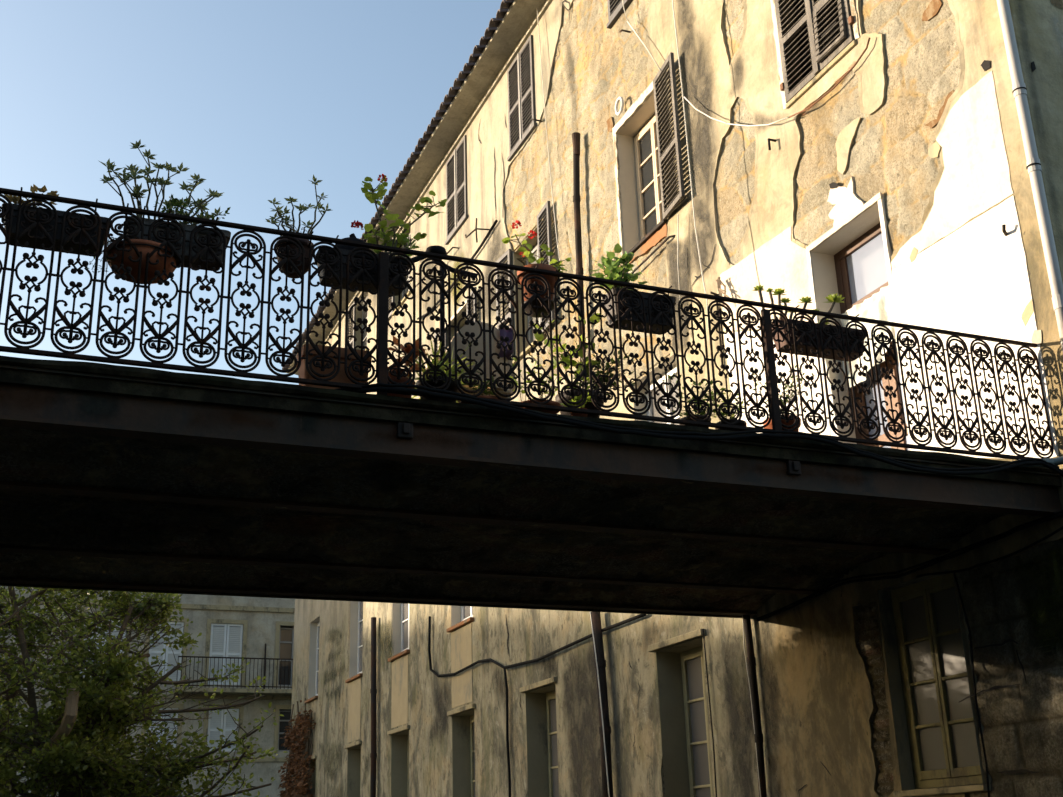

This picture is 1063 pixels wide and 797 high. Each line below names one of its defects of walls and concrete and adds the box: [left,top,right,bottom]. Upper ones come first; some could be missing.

leakage [668,0,714,349]
flaking render [720,0,747,70]
flaking render [711,94,758,266]
flaking render [791,0,965,262]
flaking render [851,598,897,797]